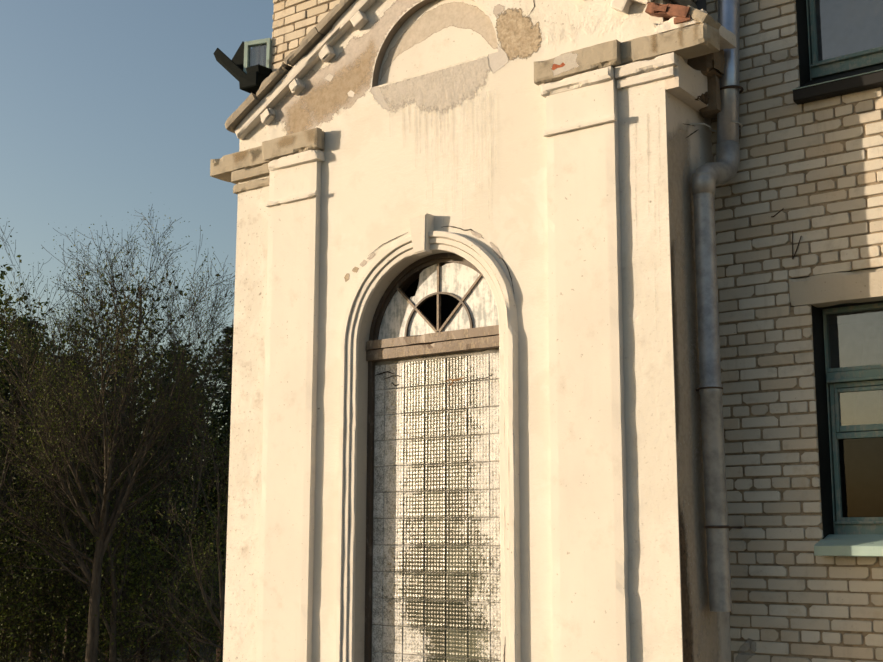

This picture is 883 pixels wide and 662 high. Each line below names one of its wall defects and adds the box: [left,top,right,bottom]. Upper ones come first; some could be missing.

flaking render [275,0,542,135]
damp [668,131,718,662]